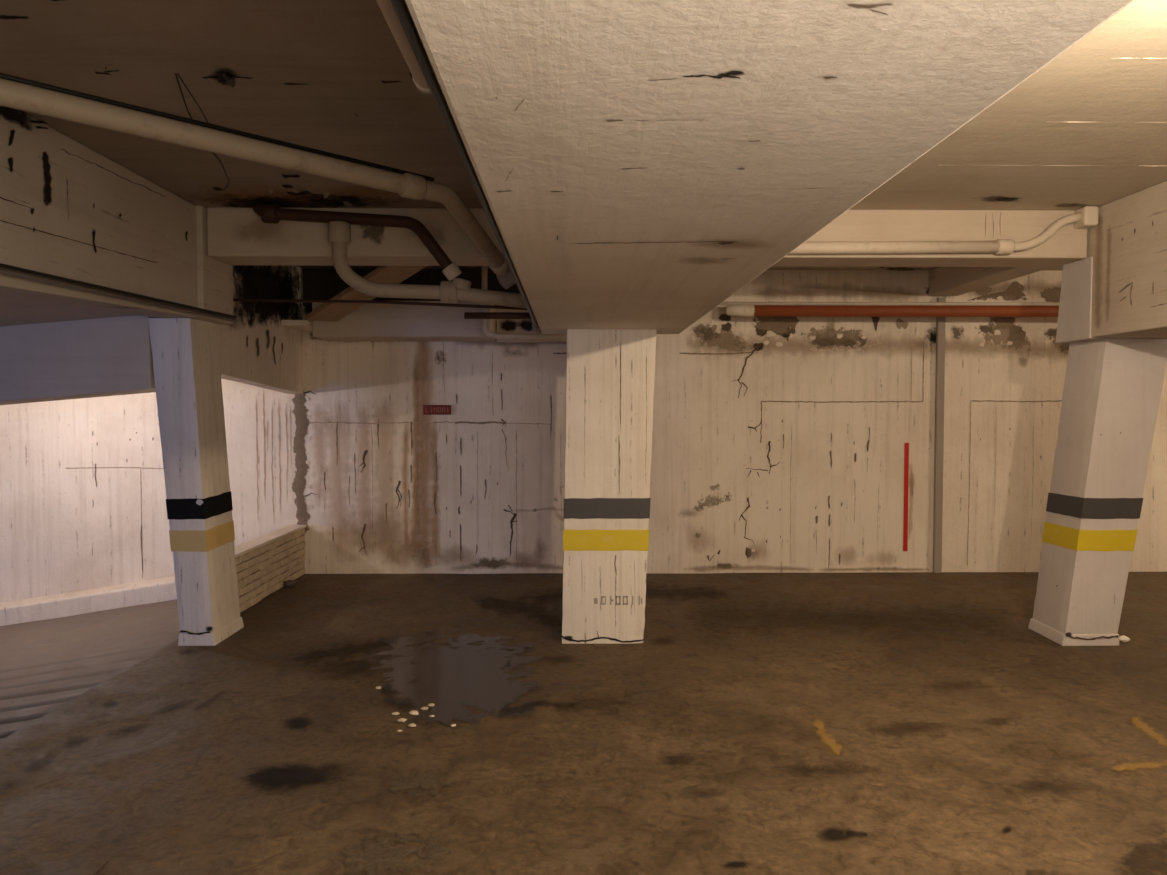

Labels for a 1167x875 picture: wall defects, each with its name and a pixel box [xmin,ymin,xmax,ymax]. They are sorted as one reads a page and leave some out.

peeling [967,281,1061,302]
peeling [691,314,908,352]
peeling [975,317,1031,351]
peeling [1045,329,1070,354]
crack [731,343,764,398]
spalling [292,390,316,533]
water stain [434,434,472,560]
crack [707,419,778,561]
crack [503,505,517,555]